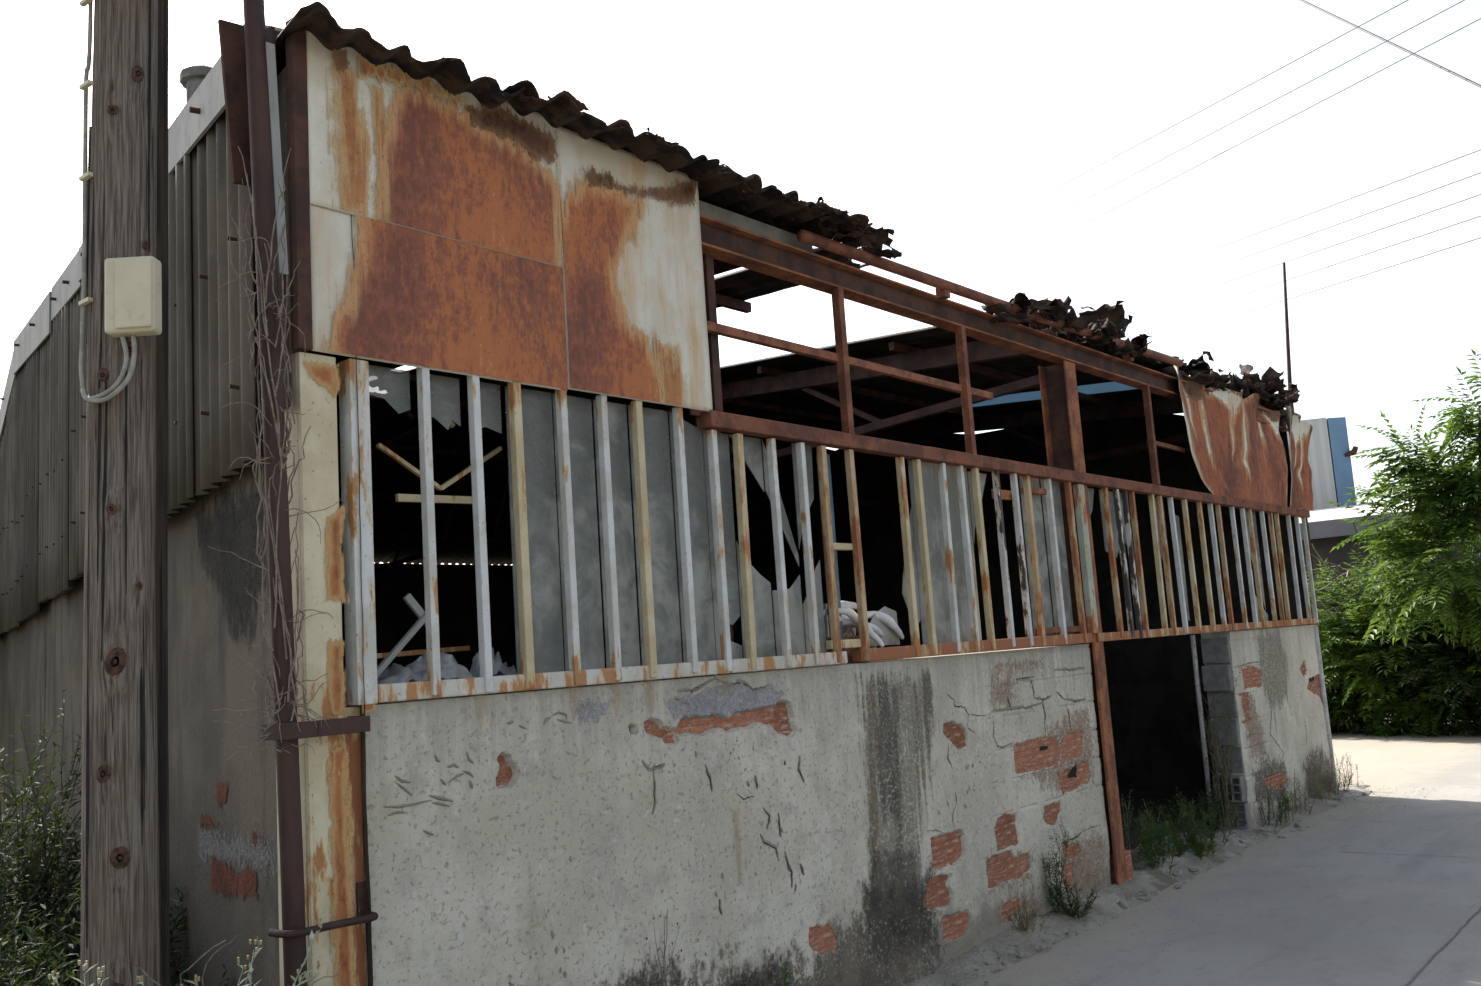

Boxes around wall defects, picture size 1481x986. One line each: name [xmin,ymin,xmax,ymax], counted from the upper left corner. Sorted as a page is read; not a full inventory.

corrosion [303,48,698,406]
corrosion [1178,364,1314,510]
corrosion [325,506,350,604]
corrosion [326,638,376,716]
spalling [628,703,792,771]
spalling [943,722,981,808]
crack [928,667,1087,833]
spalling [1013,710,1095,826]
corrosion [326,739,359,986]
leakage [605,670,942,986]
spalling [925,831,969,941]
spalling [986,813,1036,925]